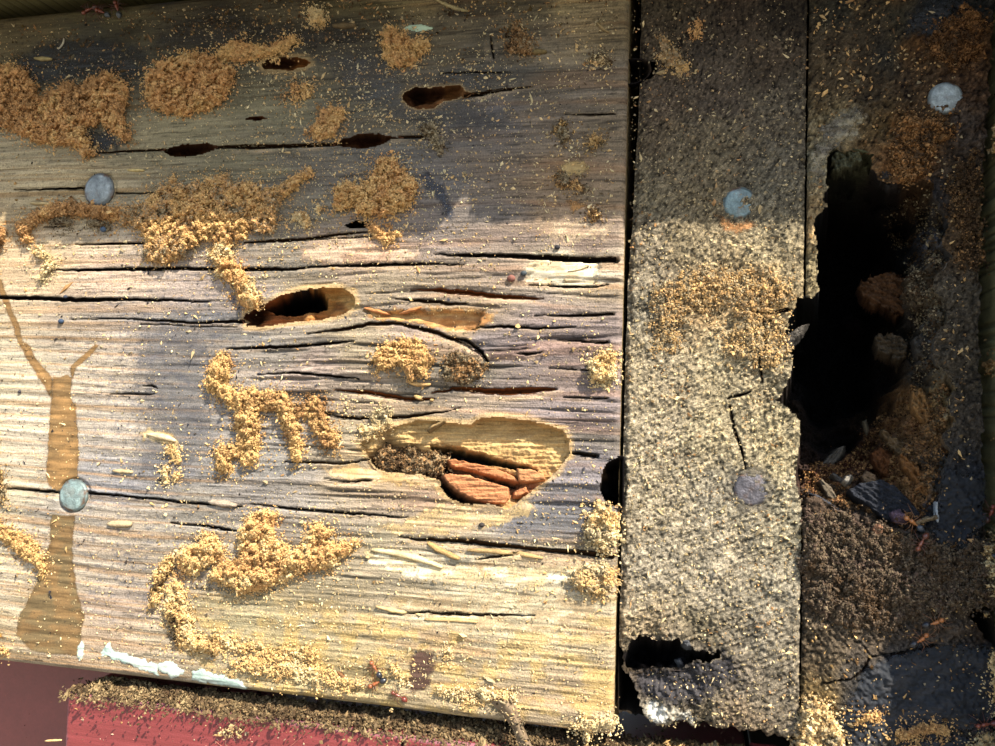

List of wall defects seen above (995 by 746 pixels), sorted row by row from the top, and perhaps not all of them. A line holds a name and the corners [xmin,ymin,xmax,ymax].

crack [0,226,616,420]
crack [727,308,789,469]